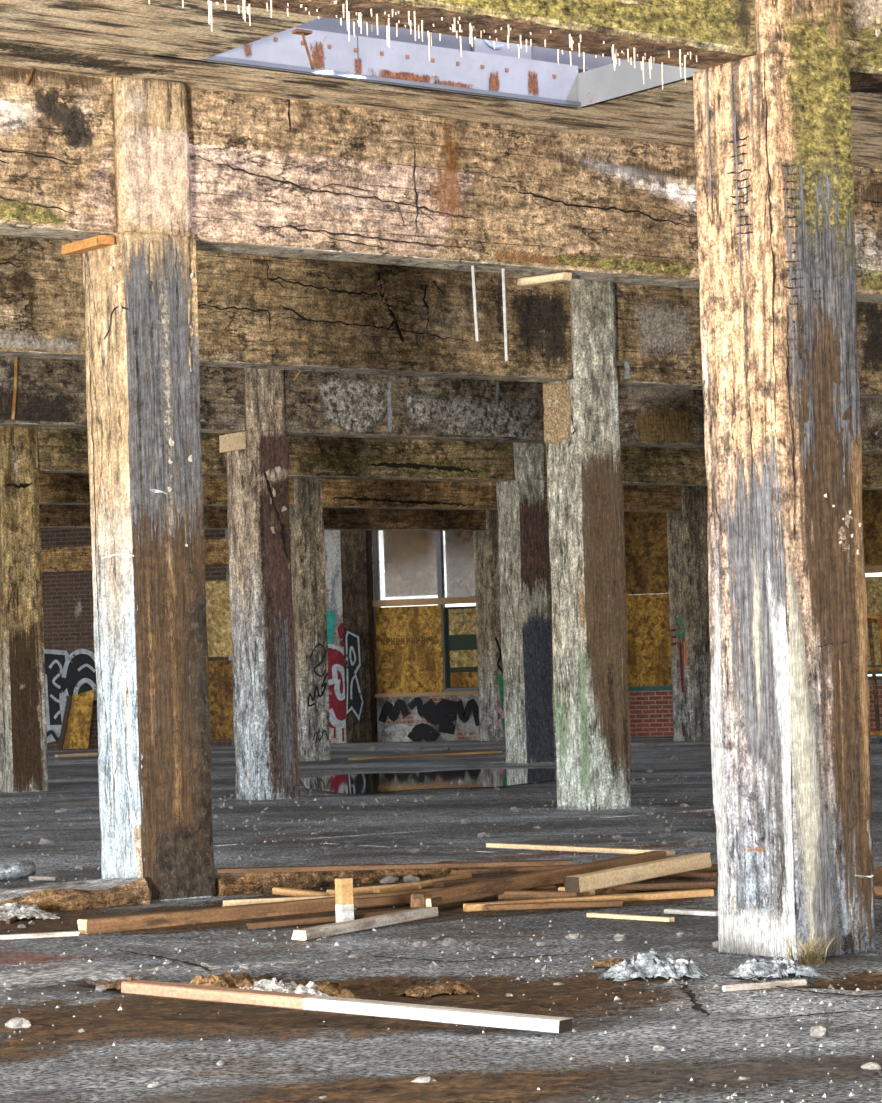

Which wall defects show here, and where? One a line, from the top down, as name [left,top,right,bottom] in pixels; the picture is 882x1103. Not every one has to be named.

corrosion [310,42,325,70]
corrosion [355,58,473,88]
corrosion [489,72,499,92]
crack [88,150,478,667]
crack [677,975,882,1022]